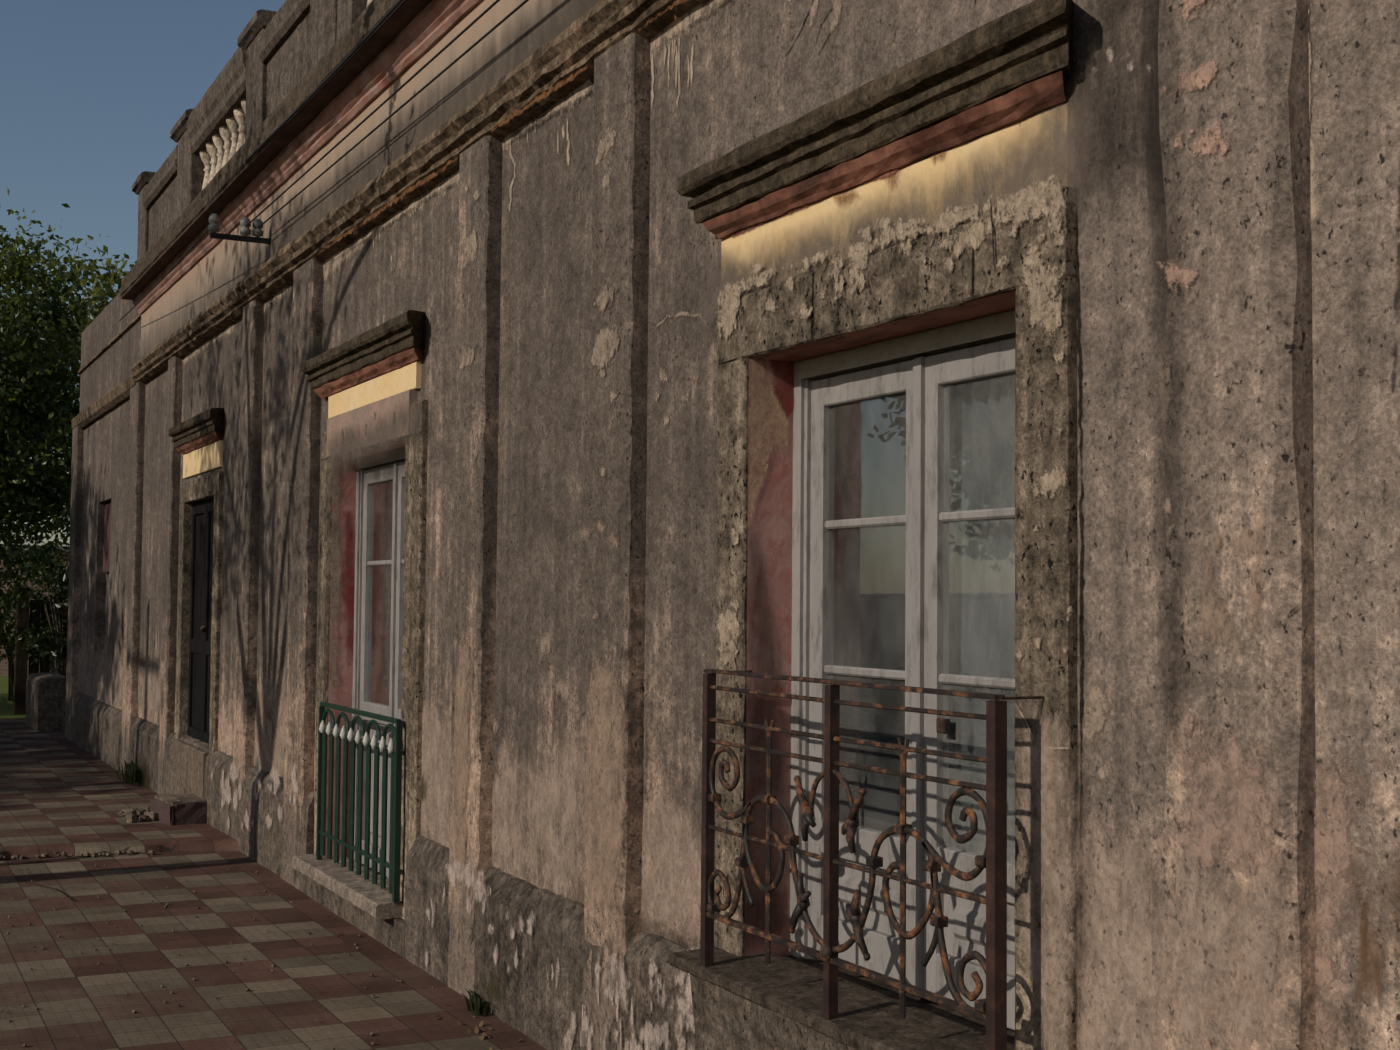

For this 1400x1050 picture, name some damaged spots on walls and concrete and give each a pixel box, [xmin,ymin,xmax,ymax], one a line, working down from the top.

peeling [1181,0,1227,20]
crack [786,0,833,56]
peeling [1161,60,1220,93]
peeling [1173,122,1229,157]
flaking render [654,175,1067,362]
peeling [1156,261,1201,293]
crack [1016,192,1084,1046]